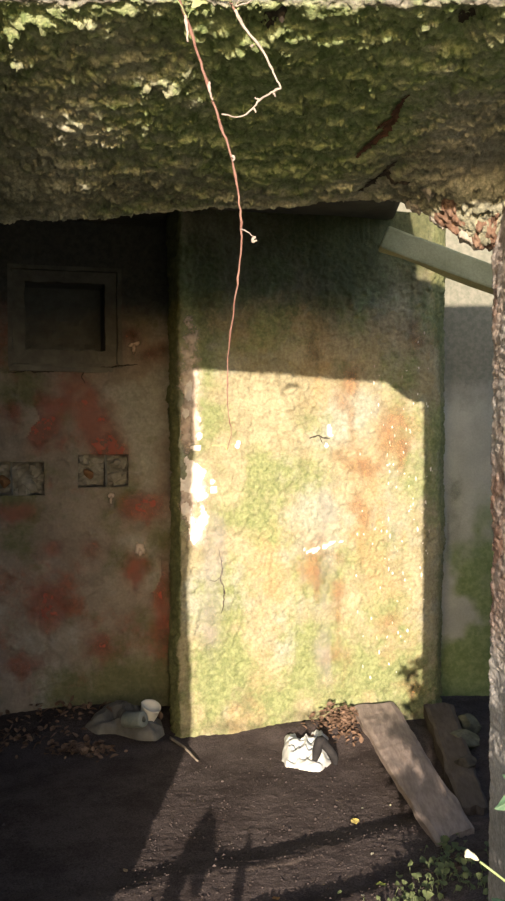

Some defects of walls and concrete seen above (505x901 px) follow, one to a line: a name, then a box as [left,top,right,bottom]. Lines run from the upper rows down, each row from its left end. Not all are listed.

spalling [403,187,503,252]
peeling [180,380,217,545]